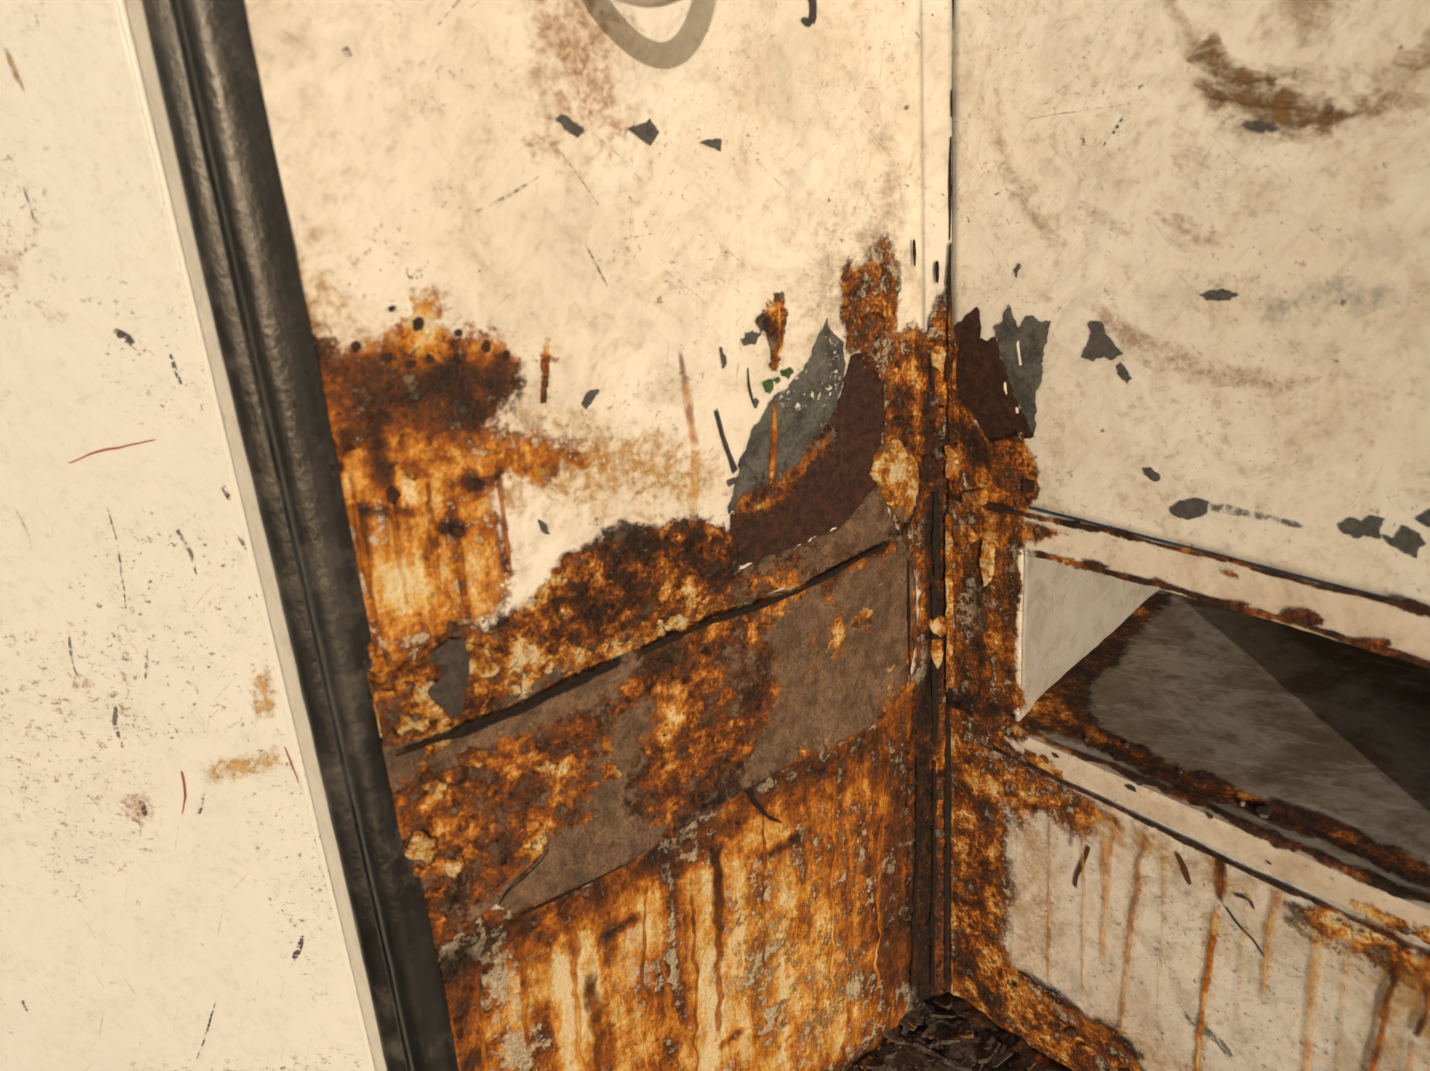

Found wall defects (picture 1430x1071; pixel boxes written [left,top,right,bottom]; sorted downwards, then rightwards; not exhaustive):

rust [310,287,774,770]
rust [435,235,1430,1071]